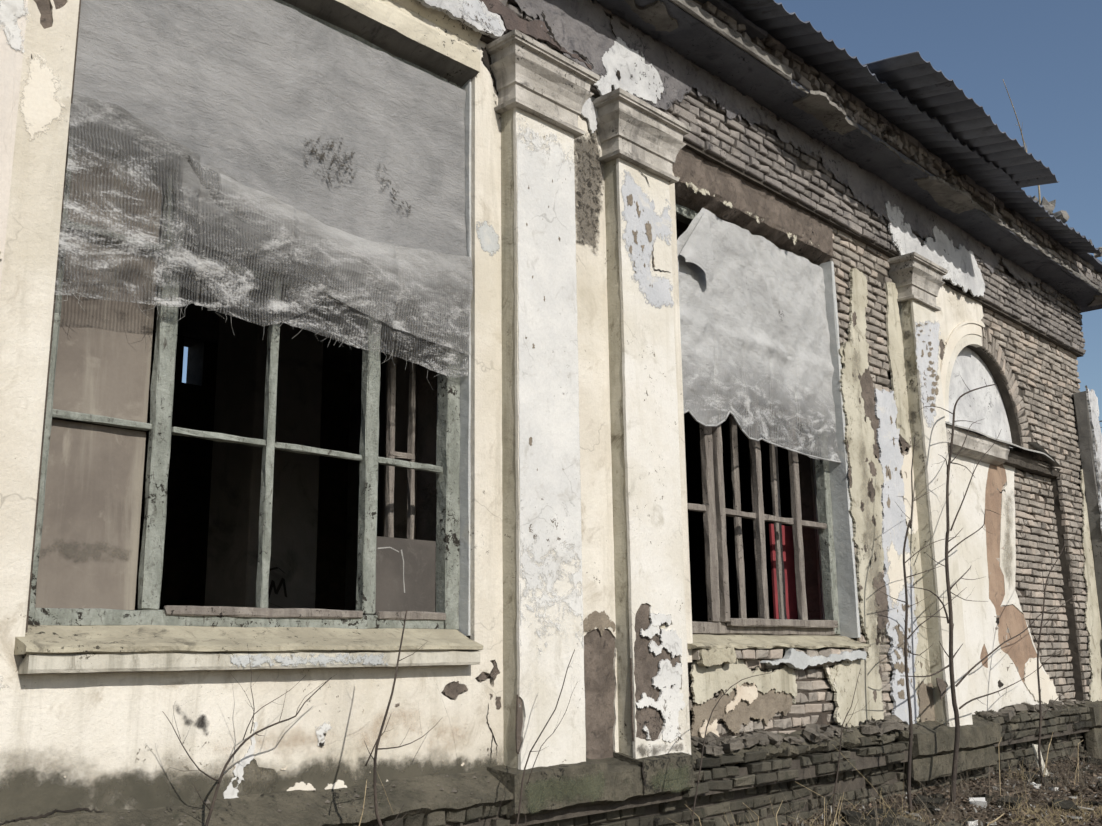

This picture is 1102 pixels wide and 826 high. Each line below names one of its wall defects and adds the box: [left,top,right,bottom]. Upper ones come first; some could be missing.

peeling [0,0,67,141]
peeling [460,0,664,134]
peeling [621,170,674,309]
peeling [885,201,985,297]
peeling [517,118,616,759]
peeling [823,268,947,728]
spalling [984,464,1059,704]
spalling [443,681,468,700]
peeling [630,603,797,742]
peeling [223,722,276,799]
leakage [0,753,502,825]
peeling [287,780,347,791]